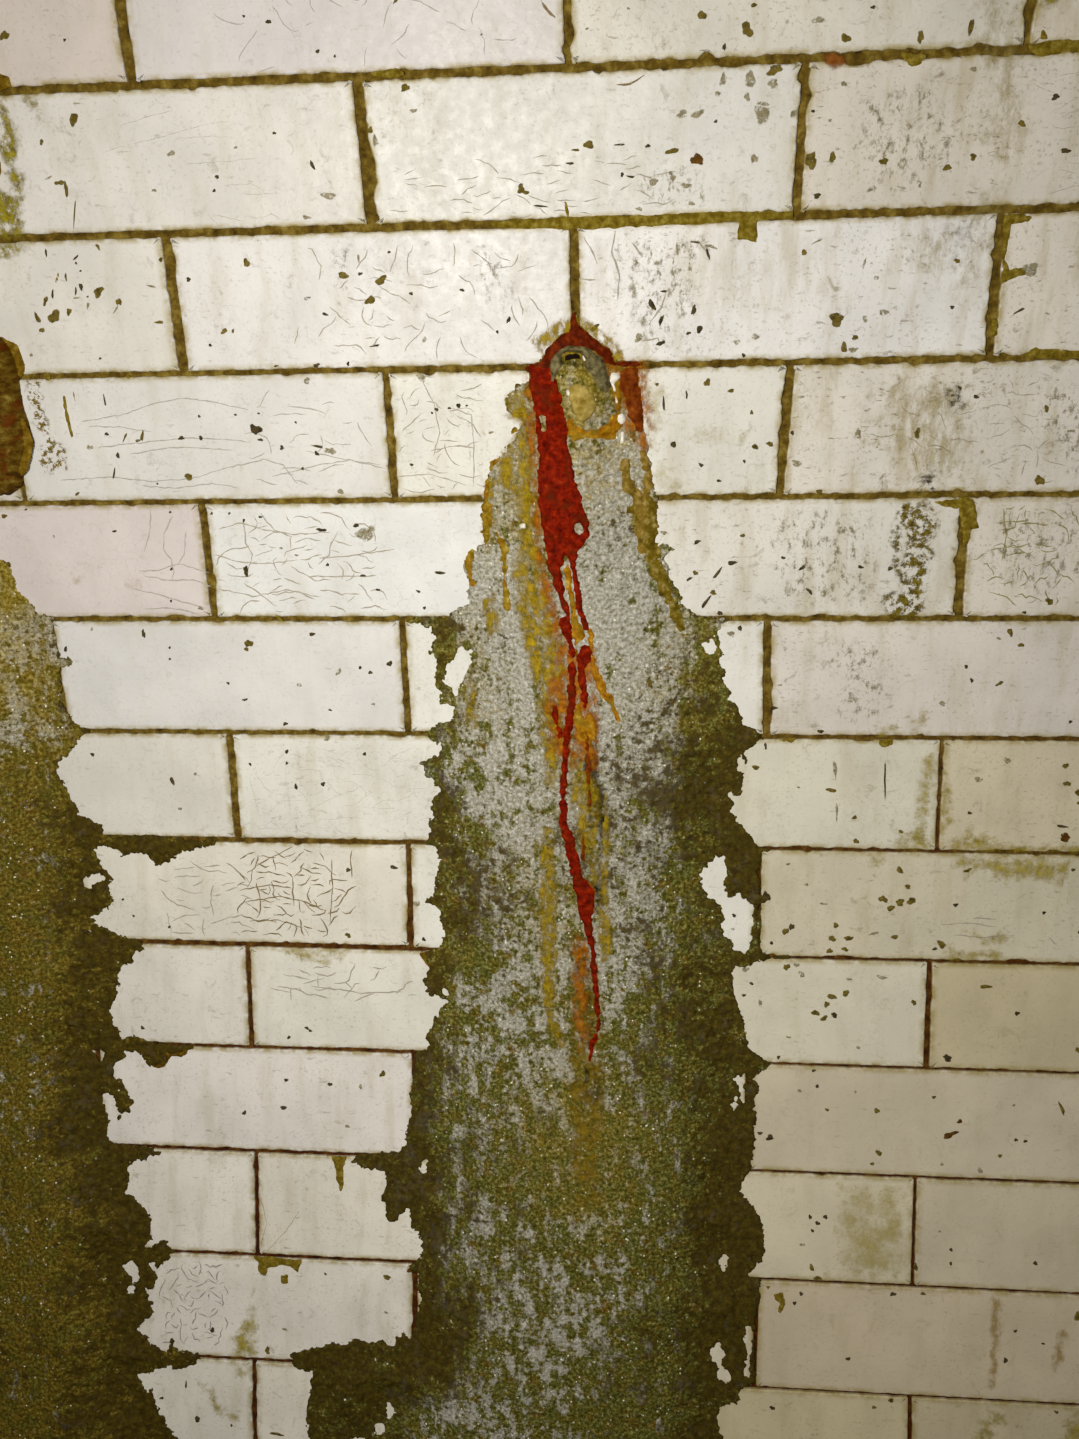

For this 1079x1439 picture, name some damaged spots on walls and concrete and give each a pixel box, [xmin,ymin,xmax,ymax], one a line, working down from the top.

damp [0,560,218,1439]
peeling [353,523,375,540]
damp [290,352,789,1439]
corrosion [464,312,689,1203]
spalling [687,561,737,615]